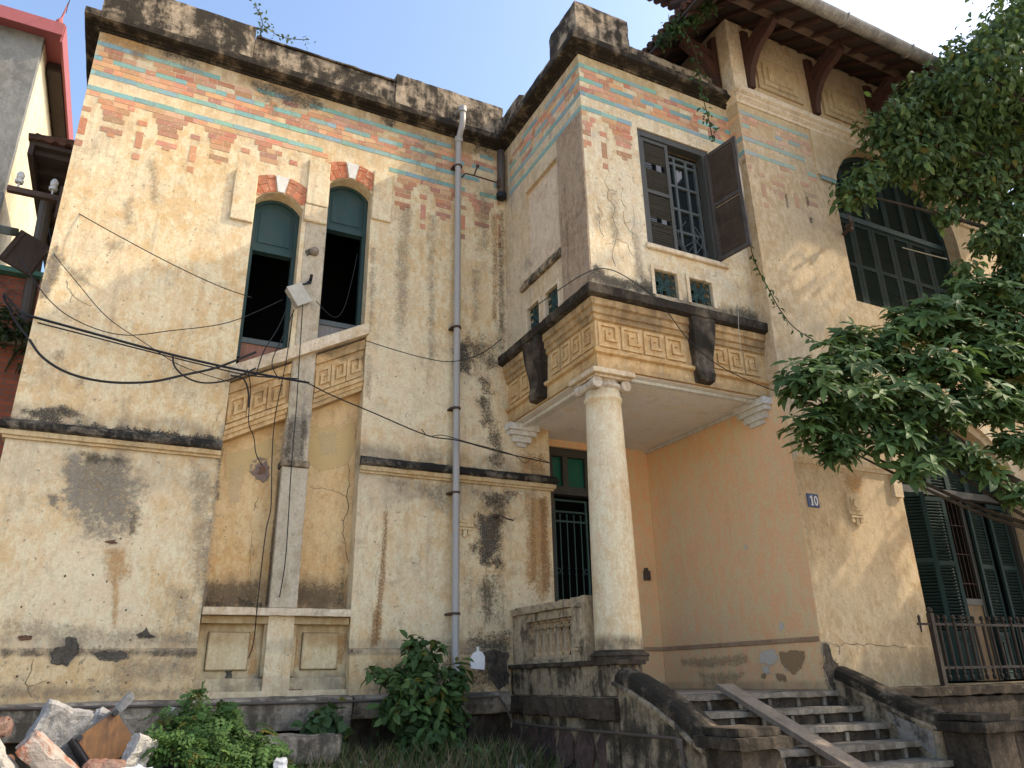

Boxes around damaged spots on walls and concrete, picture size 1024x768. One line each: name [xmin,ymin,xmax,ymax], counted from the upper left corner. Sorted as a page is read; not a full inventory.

crack [598,180,634,267]
damp [49,453,143,537]
damp [10,405,224,500]
peeling [225,438,279,504]
damp [203,414,311,607]
crack [309,466,350,593]
corrosion [371,524,387,645]
damp [469,491,517,621]
corrosion [526,497,550,600]
flaking render [47,636,80,667]
flaking render [95,615,156,662]
peeling [759,649,806,682]